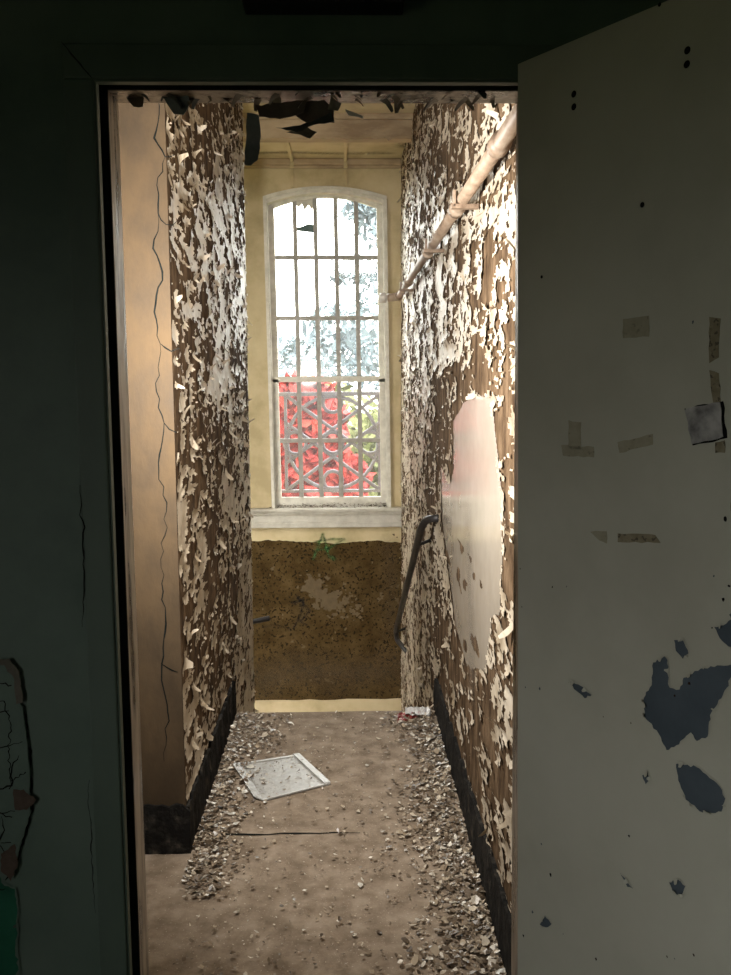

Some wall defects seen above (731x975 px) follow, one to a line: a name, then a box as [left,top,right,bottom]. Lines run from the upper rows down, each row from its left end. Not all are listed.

peeling [127,91,522,912]
peeling [0,875,21,975]